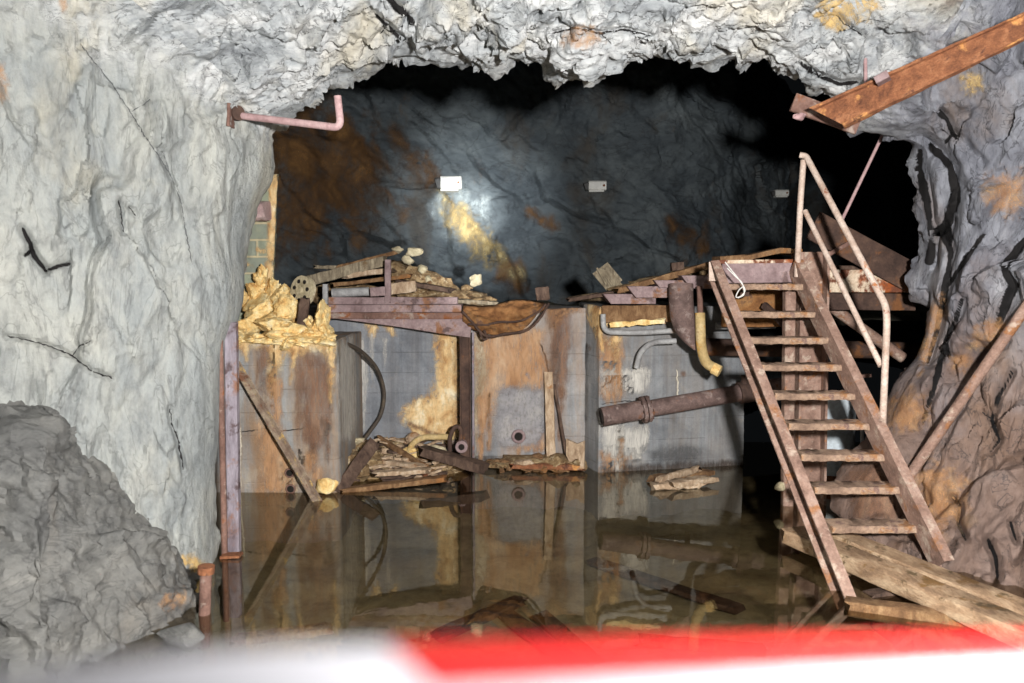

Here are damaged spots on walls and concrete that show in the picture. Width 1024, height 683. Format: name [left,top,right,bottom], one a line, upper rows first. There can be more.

rust [238,104,394,493]
rust [474,304,623,457]